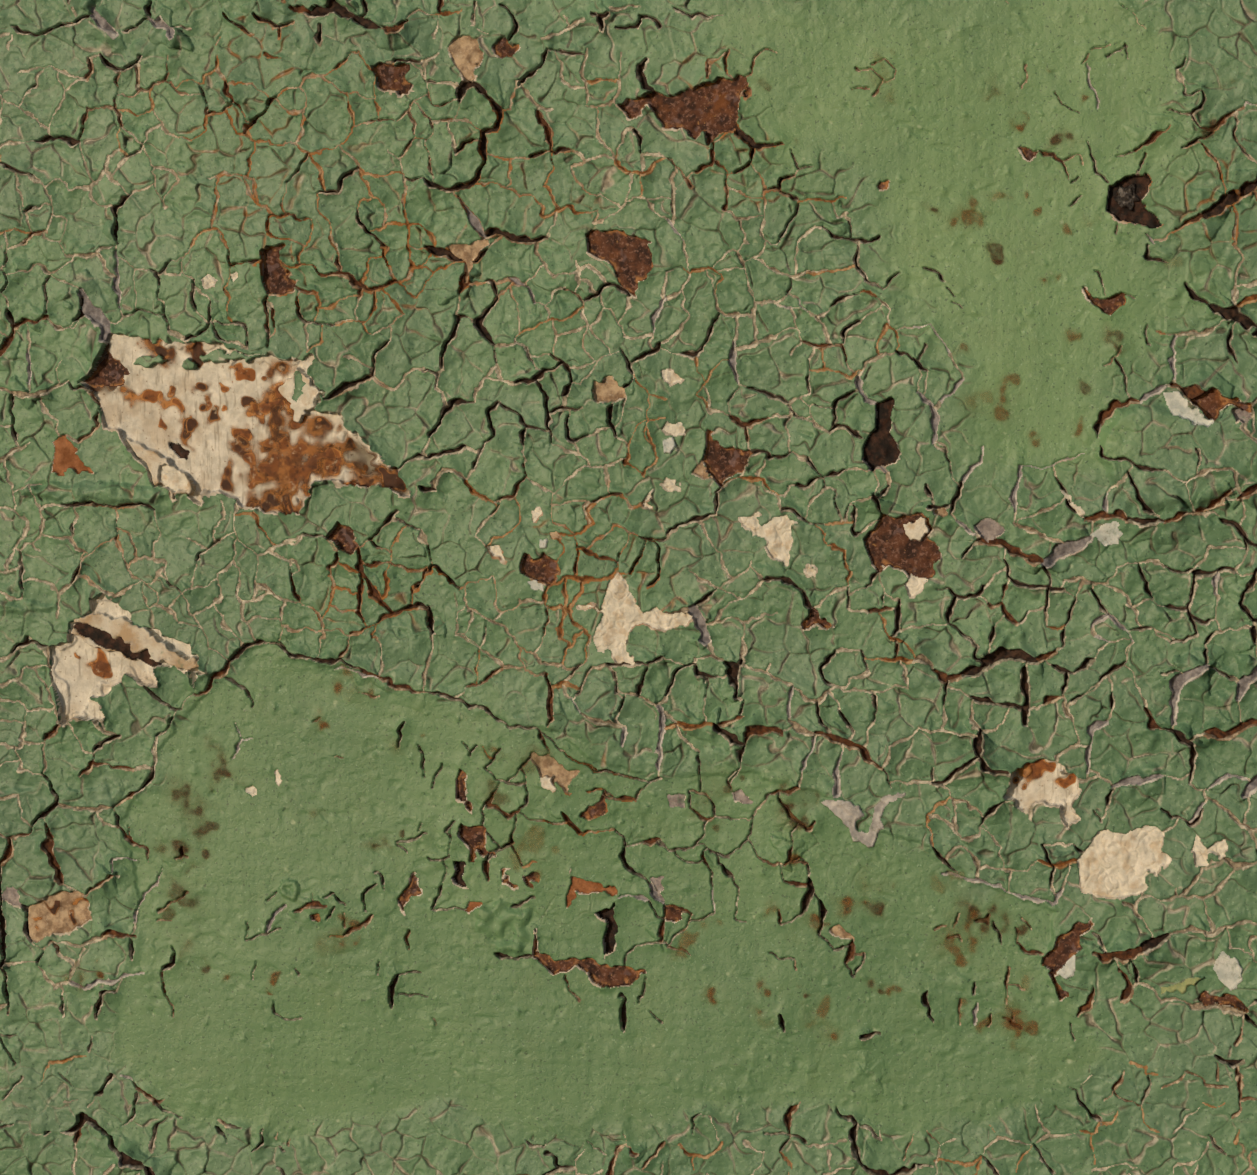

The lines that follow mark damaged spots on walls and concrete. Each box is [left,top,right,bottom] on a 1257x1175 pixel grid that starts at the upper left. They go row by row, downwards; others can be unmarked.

crack [222,0,488,47]
peeling [78,334,411,515]
crack [0,47,1257,912]
peeling [903,508,948,542]
peeling [51,593,205,727]
peeling [576,572,698,668]
peeling [1003,758,1082,830]
crack [0,830,163,1020]
crack [481,758,866,978]
peeling [1077,825,1172,900]
crack [1091,858,1257,1047]
crack [764,1054,1257,1175]